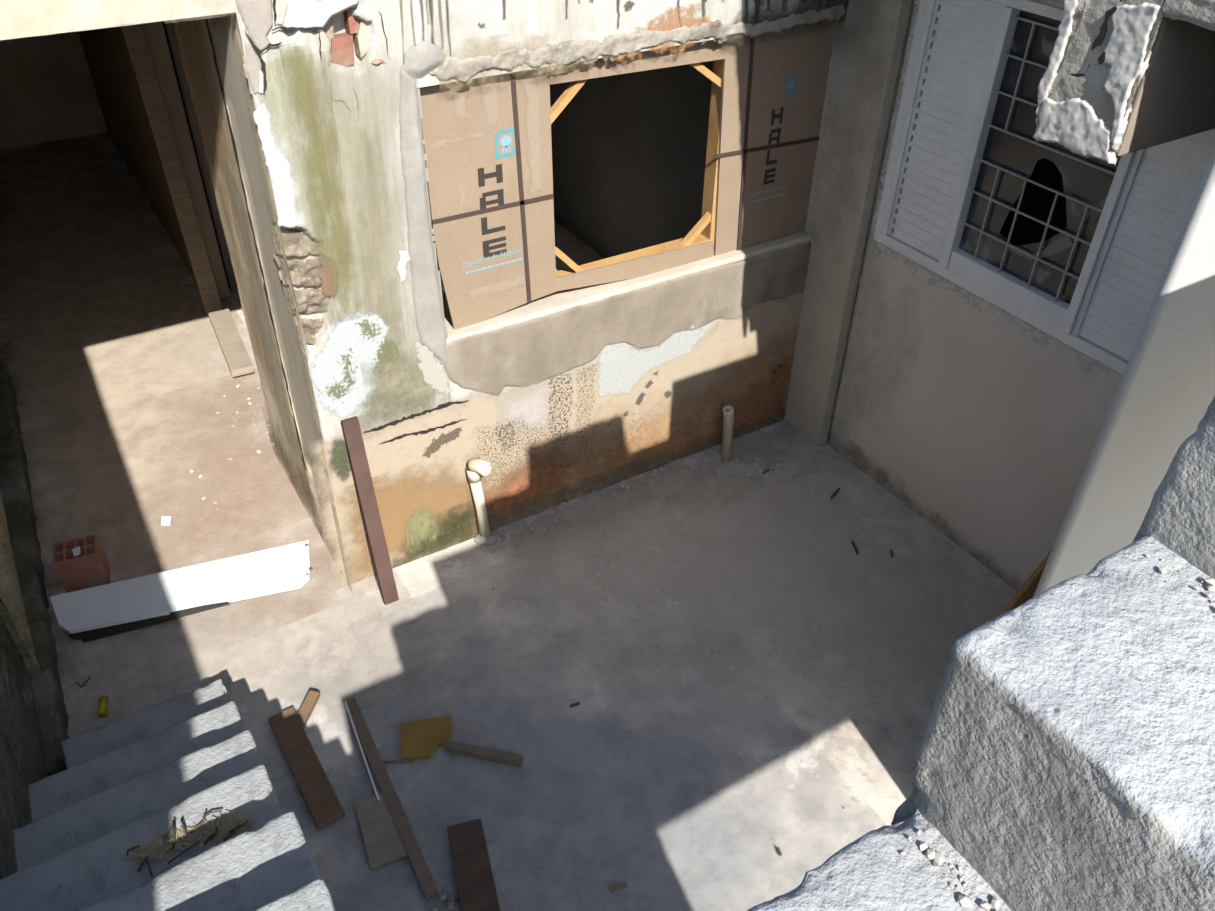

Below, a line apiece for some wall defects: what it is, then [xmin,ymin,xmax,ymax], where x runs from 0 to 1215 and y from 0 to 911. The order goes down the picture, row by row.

water stain [400,0,451,54]
water stain [617,0,634,28]
water stain [728,0,849,43]
crack [1070,0,1122,77]
peeling [1033,0,1160,165]
water stain [293,48,348,302]
peeling [209,0,389,471]
peeling [598,325,705,397]
crack [362,400,469,444]
water stain [362,291,819,568]
water stain [316,439,377,585]